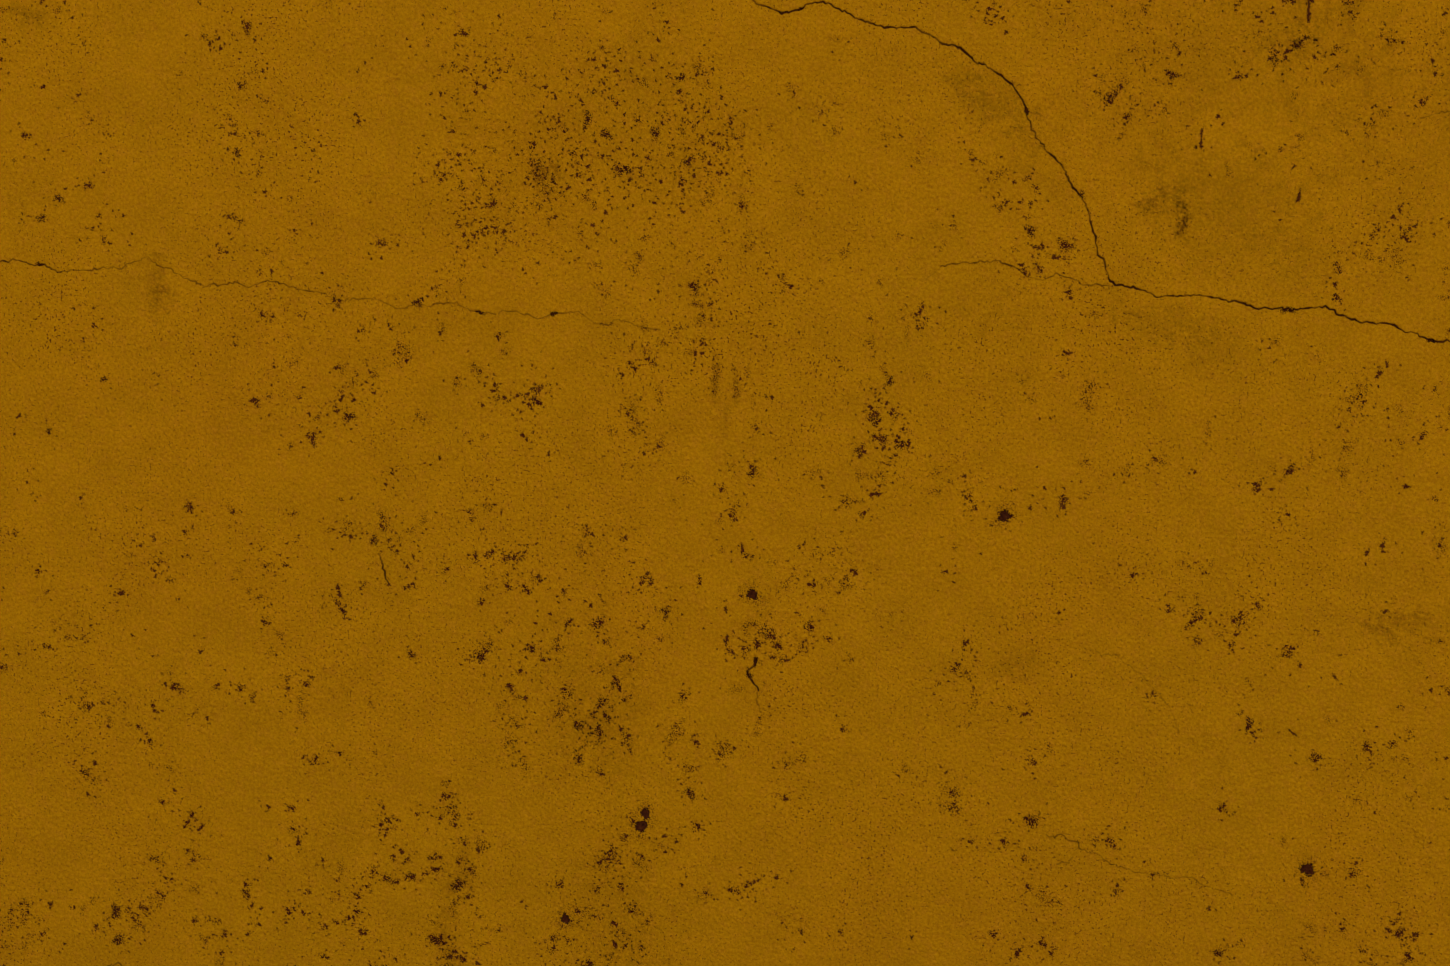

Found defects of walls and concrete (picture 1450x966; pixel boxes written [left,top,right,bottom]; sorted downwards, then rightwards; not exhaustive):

crack [0,260,97,273]
crack [753,0,1450,343]